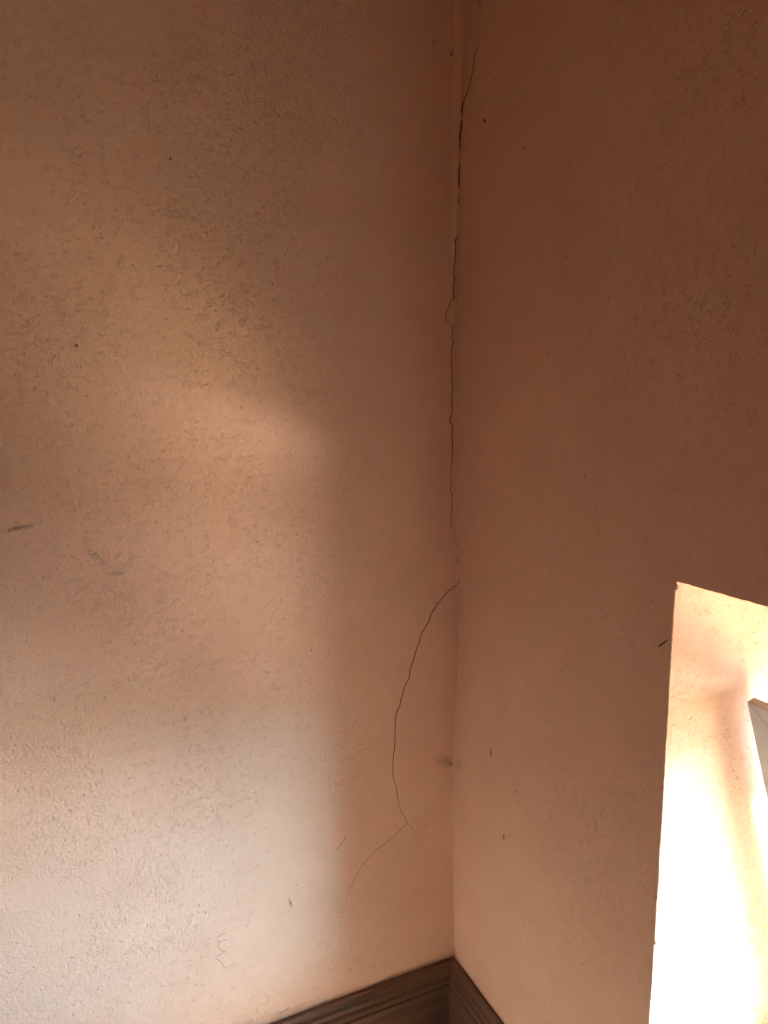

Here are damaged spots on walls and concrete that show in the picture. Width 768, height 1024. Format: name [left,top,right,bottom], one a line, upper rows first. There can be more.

crack [347,42,479,896]